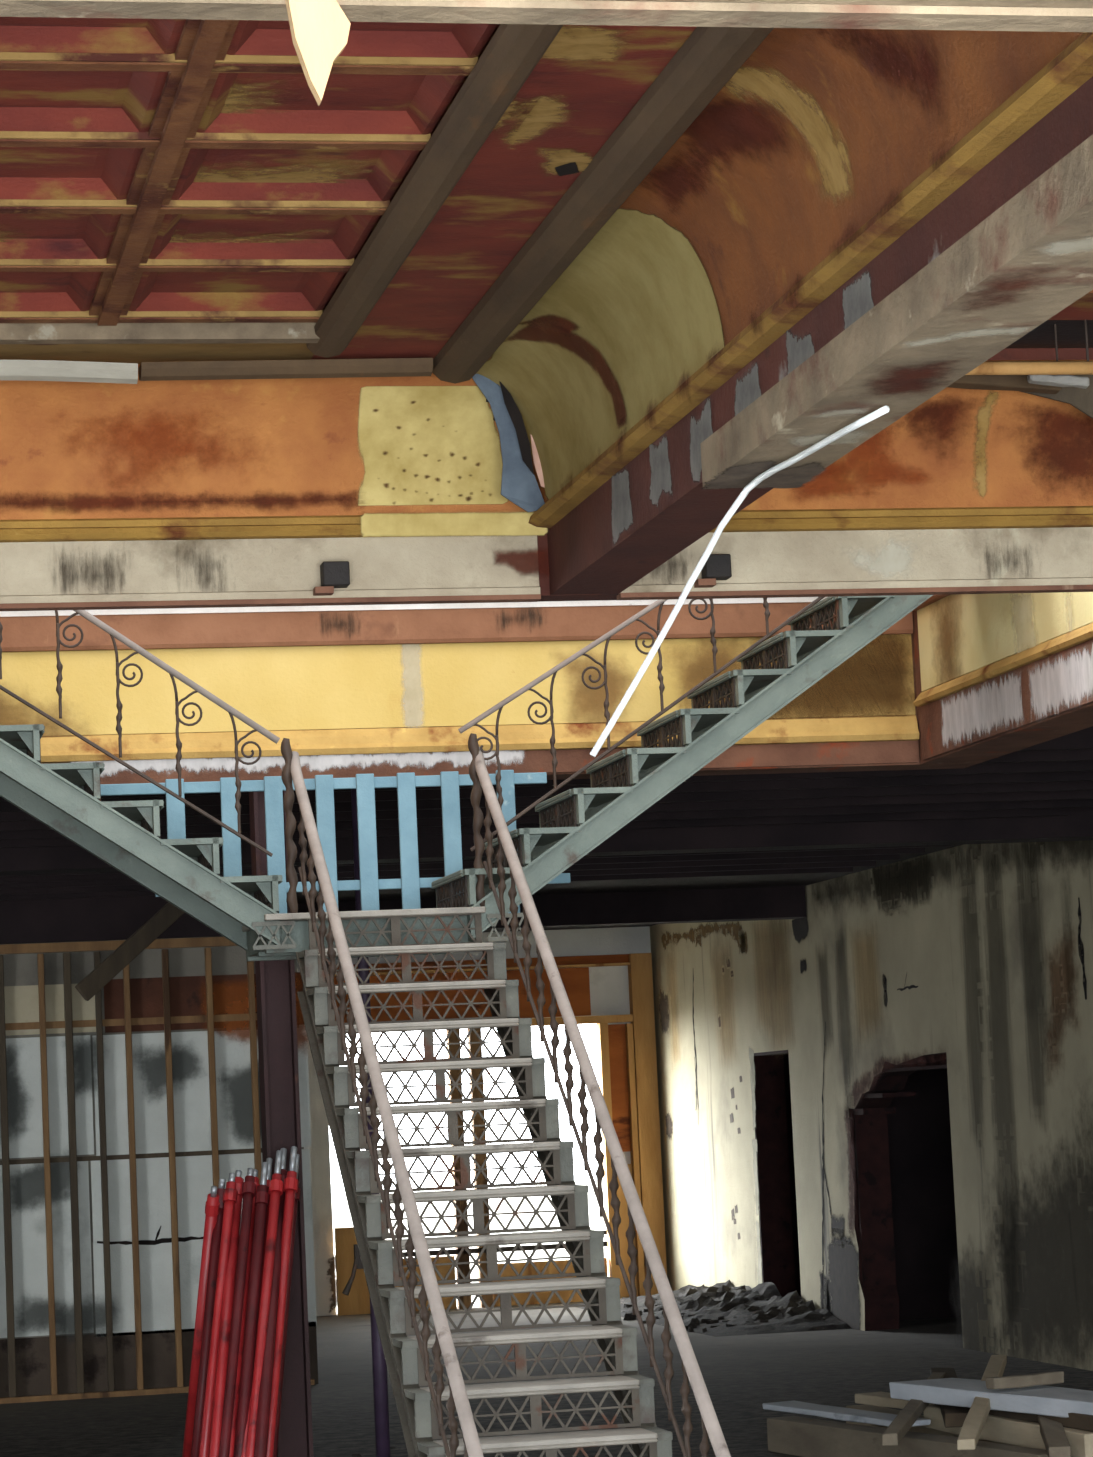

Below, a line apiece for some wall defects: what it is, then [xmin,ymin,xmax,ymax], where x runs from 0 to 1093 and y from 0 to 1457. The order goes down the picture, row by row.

rust [820,29,937,104]
rust [650,100,785,205]
peeling [842,271,874,329]
peeling [358,209,724,545]
peeling [734,362,761,416]
peeling [786,330,815,375]
spalling [689,398,826,489]
rust [0,495,356,511]
leakage [62,562,122,590]
peeling [942,644,1093,745]
crack [1078,897,1087,1000]